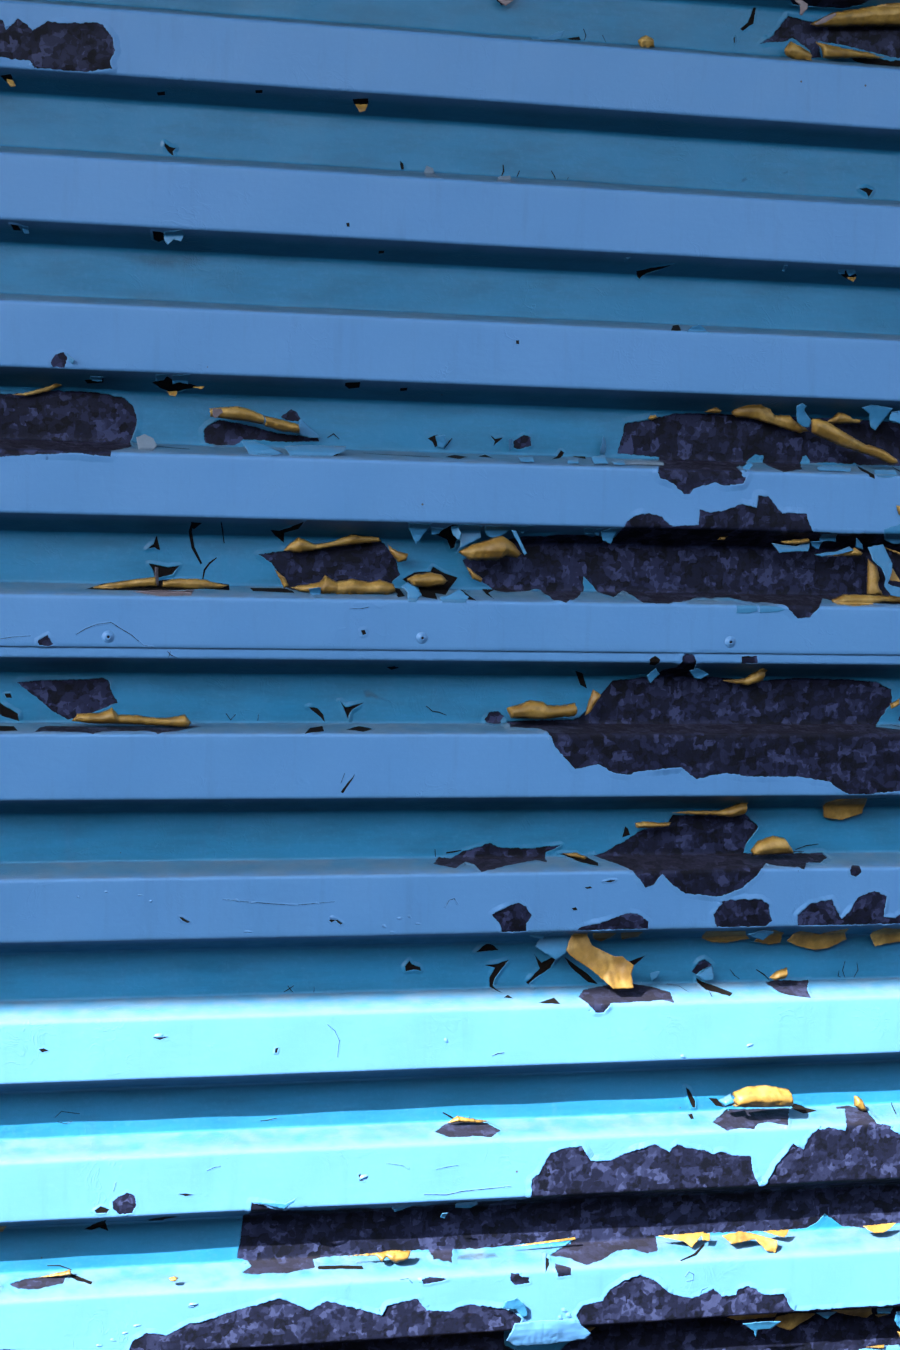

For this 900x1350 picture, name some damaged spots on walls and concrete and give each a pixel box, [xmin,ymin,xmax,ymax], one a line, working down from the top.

peeling [0,13,122,87]
peeling [756,0,900,67]
peeling [0,349,157,463]
peeling [149,374,204,397]
peeling [198,406,346,457]
peeling [248,403,900,639]
peeling [12,673,202,737]
peeling [481,649,900,796]
peeling [430,803,900,1018]
peeling [719,1093,734,1108]
peeling [92,1182,139,1217]
peeling [123,1096,900,1350]